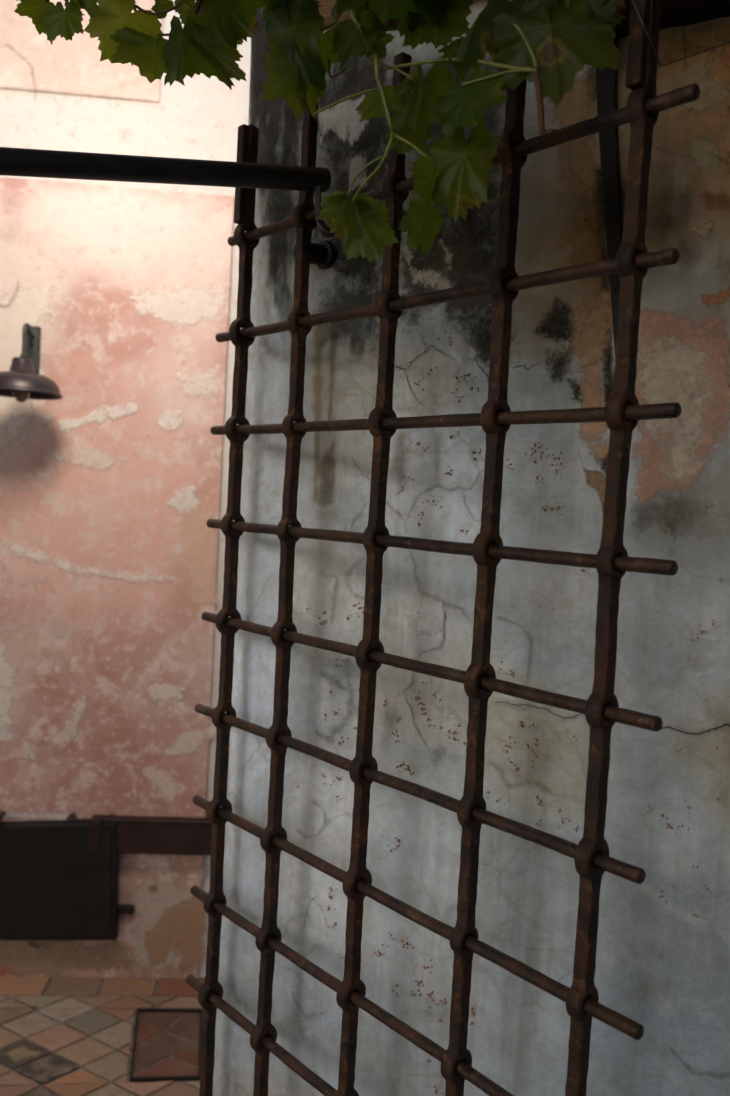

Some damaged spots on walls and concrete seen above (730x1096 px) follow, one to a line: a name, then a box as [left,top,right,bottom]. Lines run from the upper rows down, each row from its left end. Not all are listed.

water stain [250,6,303,166]
water stain [317,54,389,206]
water stain [262,189,297,318]
water stain [400,165,500,363]
peeling [0,281,62,371]
peeling [0,396,139,457]
water stain [536,299,582,402]
flaking render [631,288,730,502]
flaking render [166,483,217,604]
crack [495,701,585,718]
crack [661,723,730,734]
flaking render [0,865,206,976]